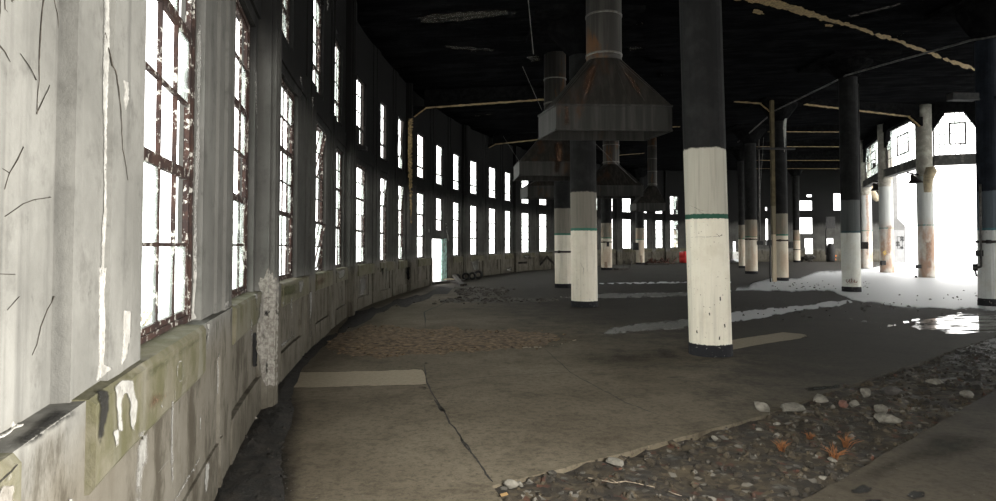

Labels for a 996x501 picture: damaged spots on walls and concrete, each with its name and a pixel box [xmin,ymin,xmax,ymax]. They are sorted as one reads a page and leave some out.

peeling [96,0,132,381]
crack [424,364,493,482]
flaking render [0,485,14,501]